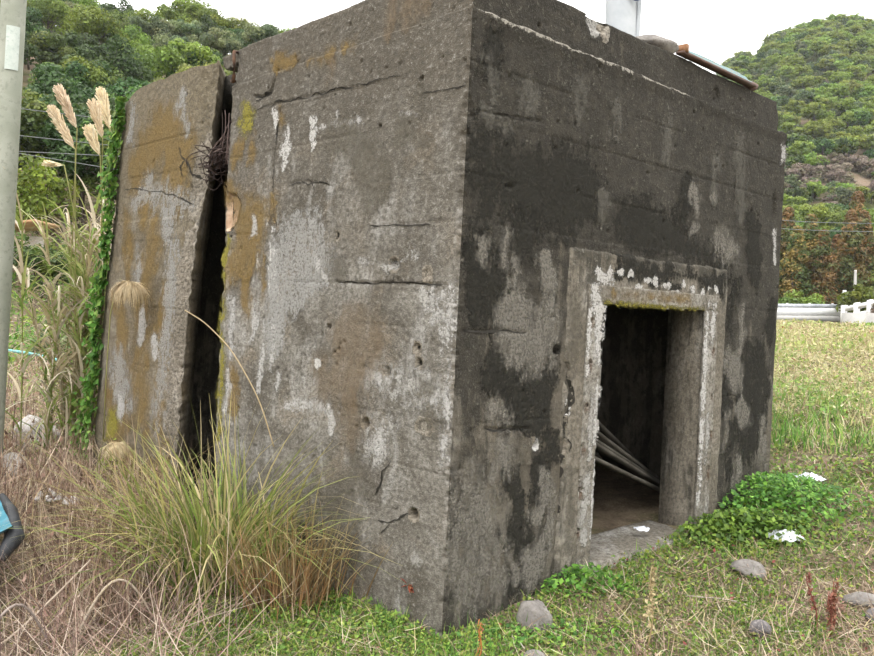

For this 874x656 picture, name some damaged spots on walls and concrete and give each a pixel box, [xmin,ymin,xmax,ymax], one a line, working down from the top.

water stain [126,102,138,147]
water stain [175,87,191,138]
crack [255,75,401,217]
crack [423,85,466,93]
spalling [226,192,241,231]
water stain [381,249,419,271]
water stain [131,170,194,437]
water stain [419,25,778,598]
water stain [109,342,133,421]
water stain [356,350,453,468]
peeling [579,265,718,547]
crack [378,513,408,533]